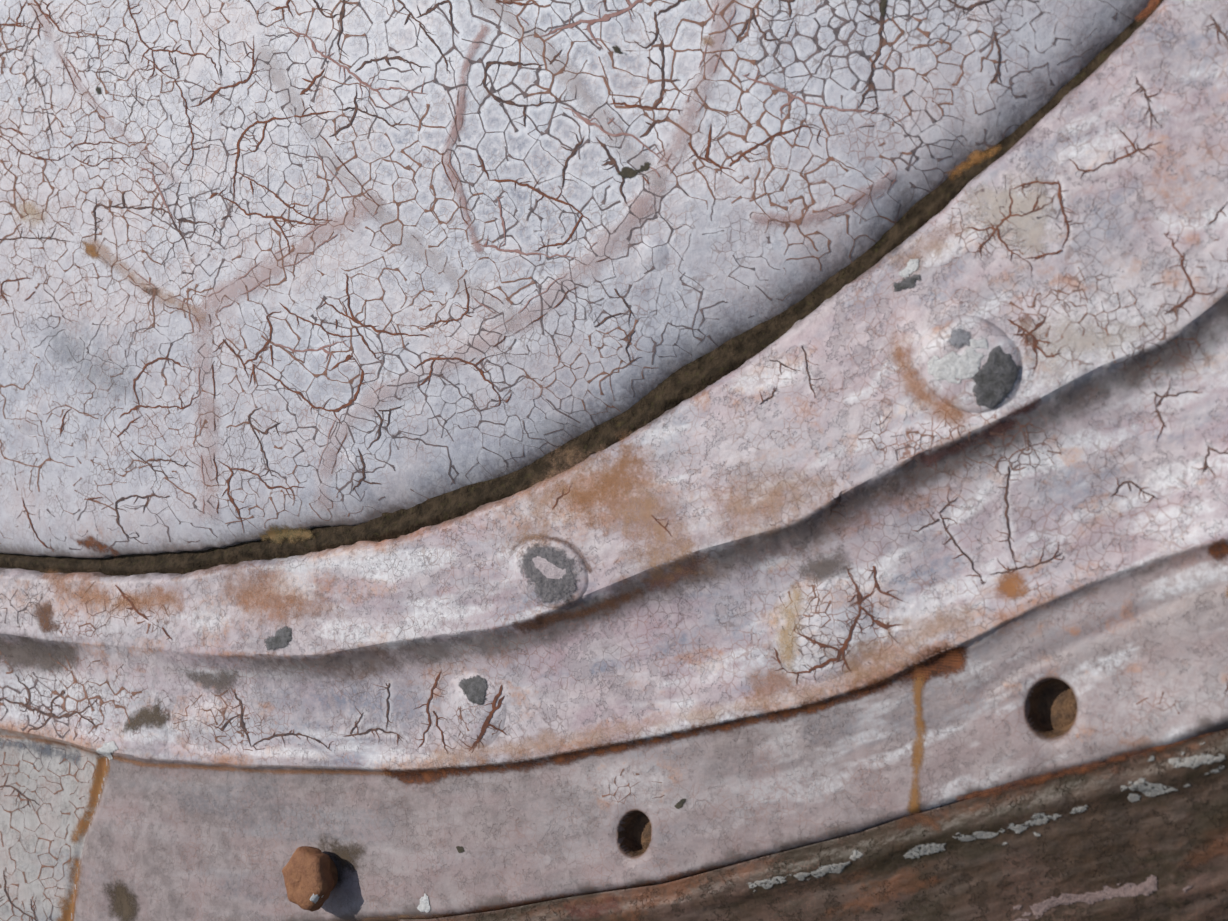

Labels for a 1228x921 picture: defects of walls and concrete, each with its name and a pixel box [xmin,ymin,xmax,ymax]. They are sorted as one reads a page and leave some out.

crack [0,0,1228,552]
corrosion [895,348,962,423]
peeling [927,328,1022,409]
crack [858,404,1064,600]
corrosion [1208,539,1228,560]
peeling [459,675,488,705]
crack [0,582,172,921]
crack [602,769,664,803]
corrosion [362,619,1228,921]
peeling [903,804,1087,859]
corrosion [57,859,80,921]
peeling [1013,875,1157,921]